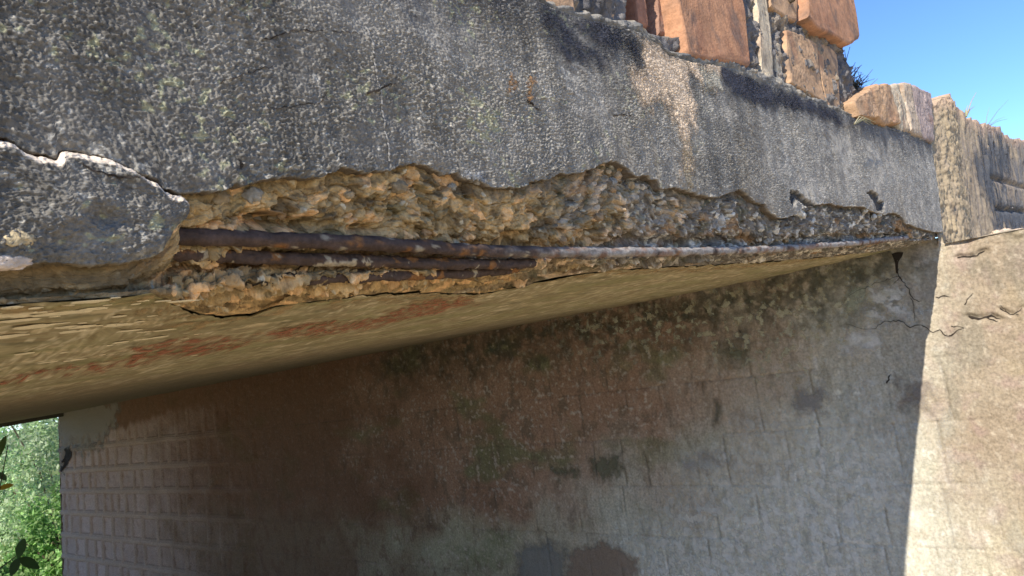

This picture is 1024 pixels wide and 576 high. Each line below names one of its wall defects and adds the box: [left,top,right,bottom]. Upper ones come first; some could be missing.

spalling [0,141,938,355]
crack [848,273,1020,336]
damp [632,389,919,576]